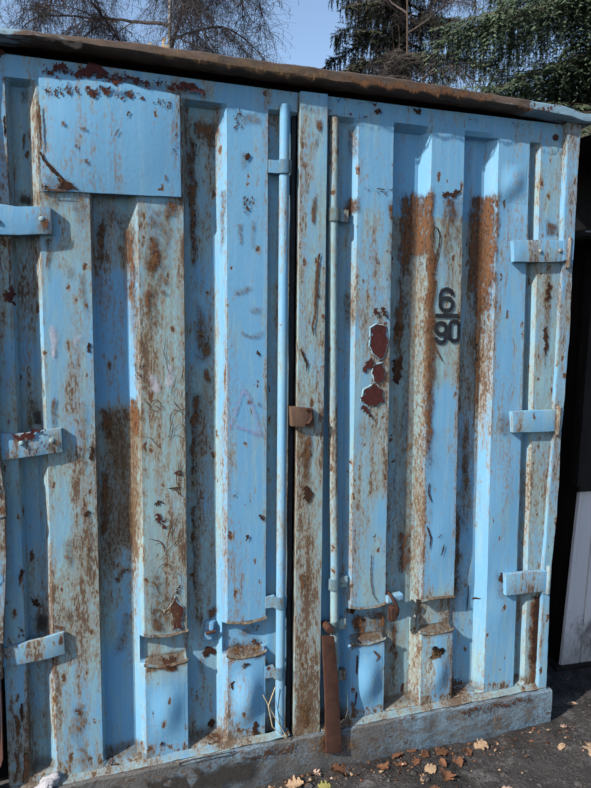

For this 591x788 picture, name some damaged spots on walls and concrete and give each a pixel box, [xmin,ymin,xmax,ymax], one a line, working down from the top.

peeling [39,62,210,103]
rust [228,60,493,102]
rust [187,120,219,264]
rust [97,202,176,380]
peeling [360,307,389,417]
rust [389,189,500,595]
rust [101,399,142,567]
rust [299,436,314,504]
rust [31,597,72,636]
rust [154,656,177,672]
rust [199,646,216,666]
rust [348,608,398,690]